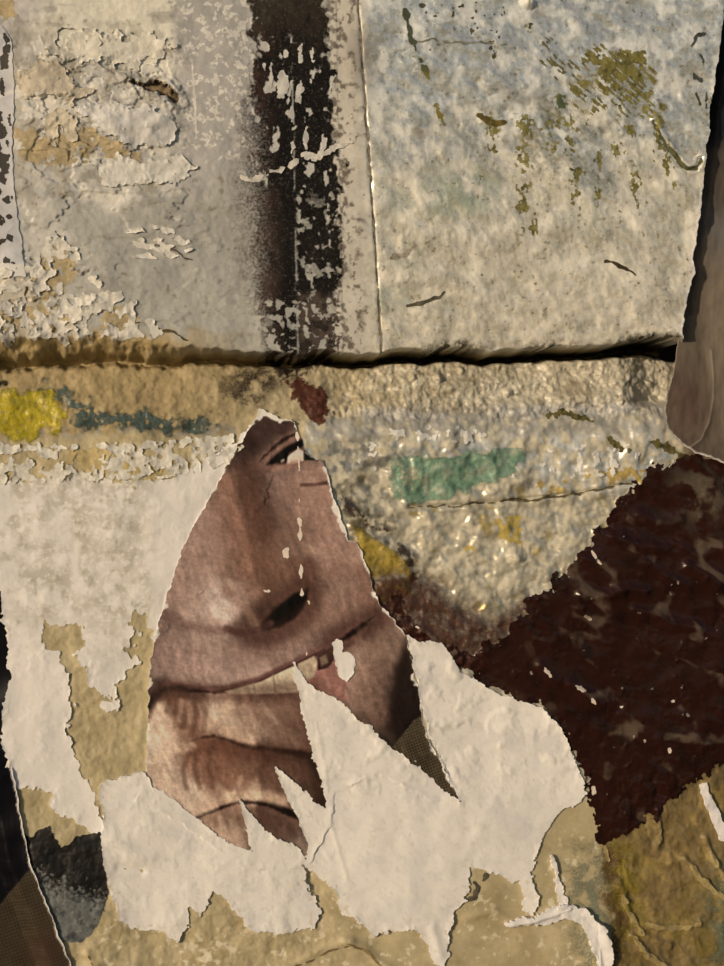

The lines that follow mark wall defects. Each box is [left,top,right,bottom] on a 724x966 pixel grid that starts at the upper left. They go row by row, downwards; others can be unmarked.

peeling [240,126,354,183]
peeling [126,224,193,259]
peeling [0,236,169,363]
peeling [0,433,244,485]
peeling [332,639,356,682]
peeling [504,854,614,966]